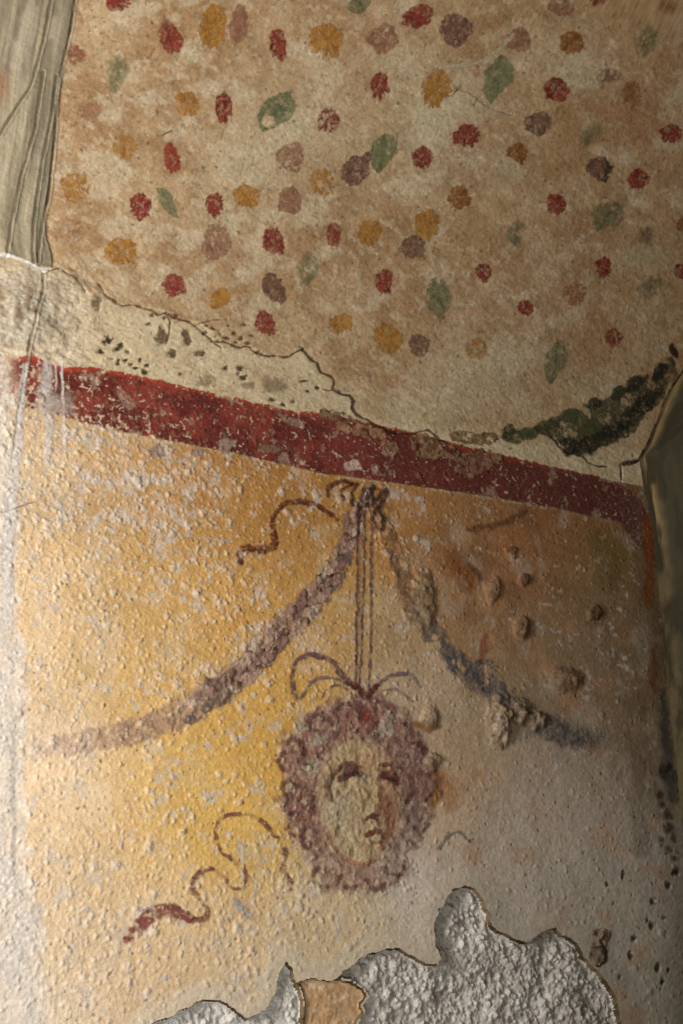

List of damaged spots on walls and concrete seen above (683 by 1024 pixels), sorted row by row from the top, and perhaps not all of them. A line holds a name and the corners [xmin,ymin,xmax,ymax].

crack [50,268,448,443]
crack [553,371,683,480]
flaking render [152,885,621,1024]